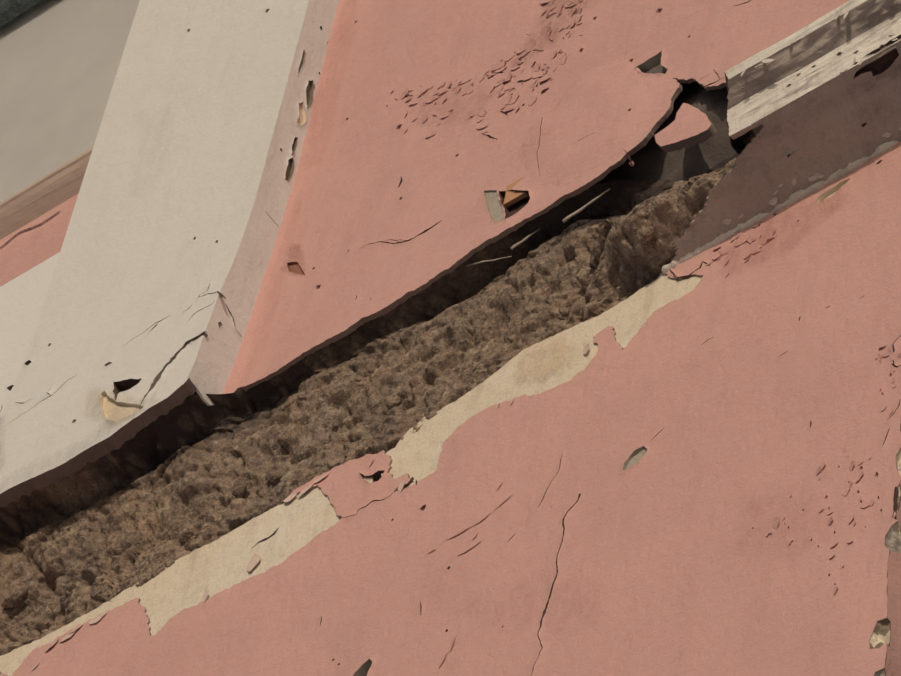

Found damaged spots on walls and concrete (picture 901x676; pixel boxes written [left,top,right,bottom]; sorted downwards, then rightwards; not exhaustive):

spalling [297,72,320,125]
peeling [386,0,583,140]
spalling [840,32,901,79]
crack [370,221,441,244]
crack [136,285,240,404]
flaking render [0,80,775,676]
spalling [885,449,901,553]
crack [531,494,581,675]
spalling [870,618,890,649]